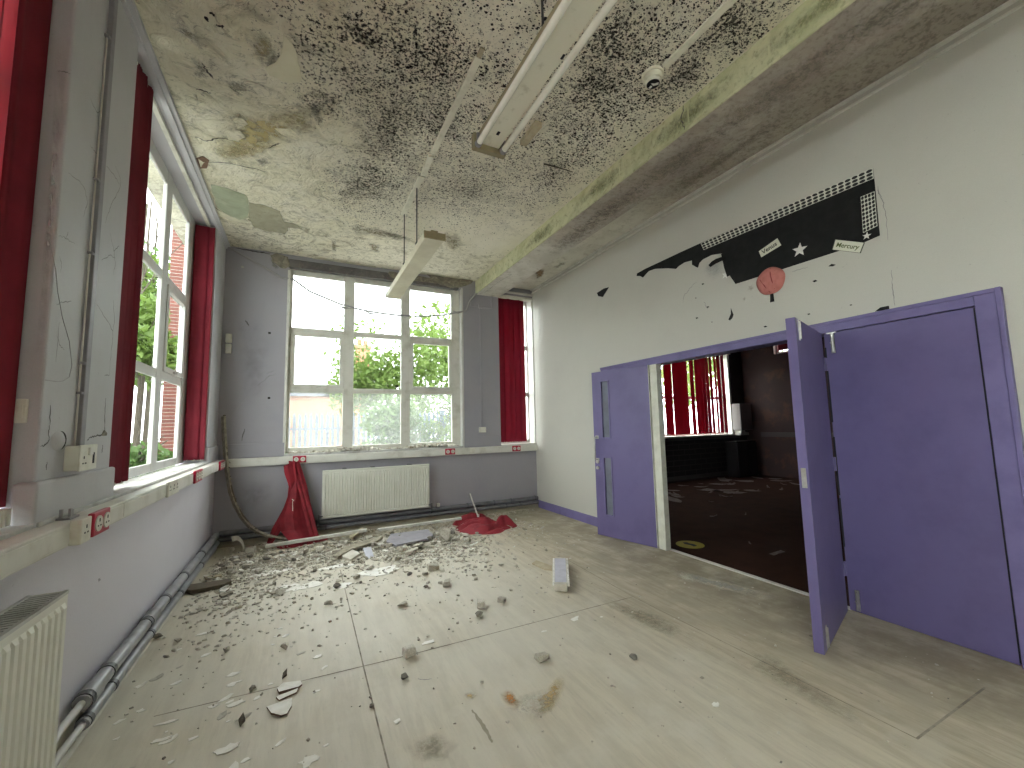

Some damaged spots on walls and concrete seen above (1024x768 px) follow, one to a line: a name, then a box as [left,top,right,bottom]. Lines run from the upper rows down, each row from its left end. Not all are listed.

peeling [266,34,301,83]
peeling [225,118,248,141]
damp [229,0,799,250]
peeling [211,185,303,234]
crack [87,300,115,452]